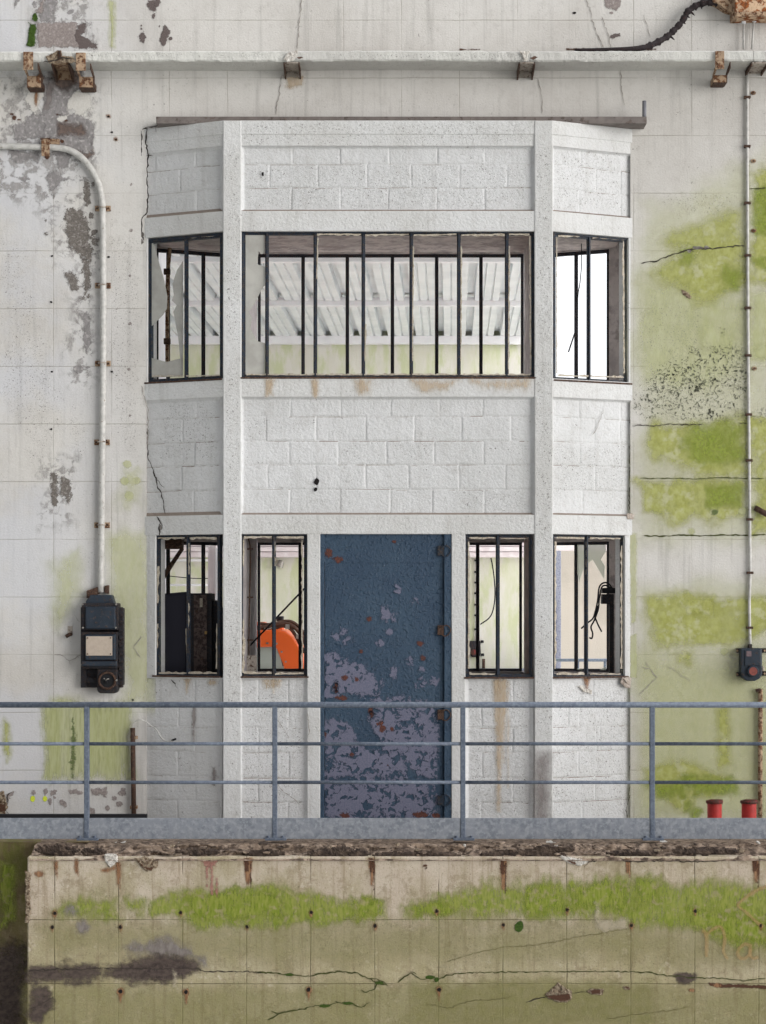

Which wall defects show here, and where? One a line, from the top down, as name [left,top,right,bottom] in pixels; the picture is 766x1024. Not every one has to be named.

peeling [57,90,93,122]
crack [141,125,166,244]
crack [641,245,744,264]
peeling [63,180,137,450]
crack [142,387,165,535]
peeling [324,626,443,818]
corrosion [495,680,506,768]
spalling [0,791,14,814]
corrosion [244,858,253,888]
leakage [596,910,626,931]
leakage [0,937,206,1024]
crack [27,929,765,1020]